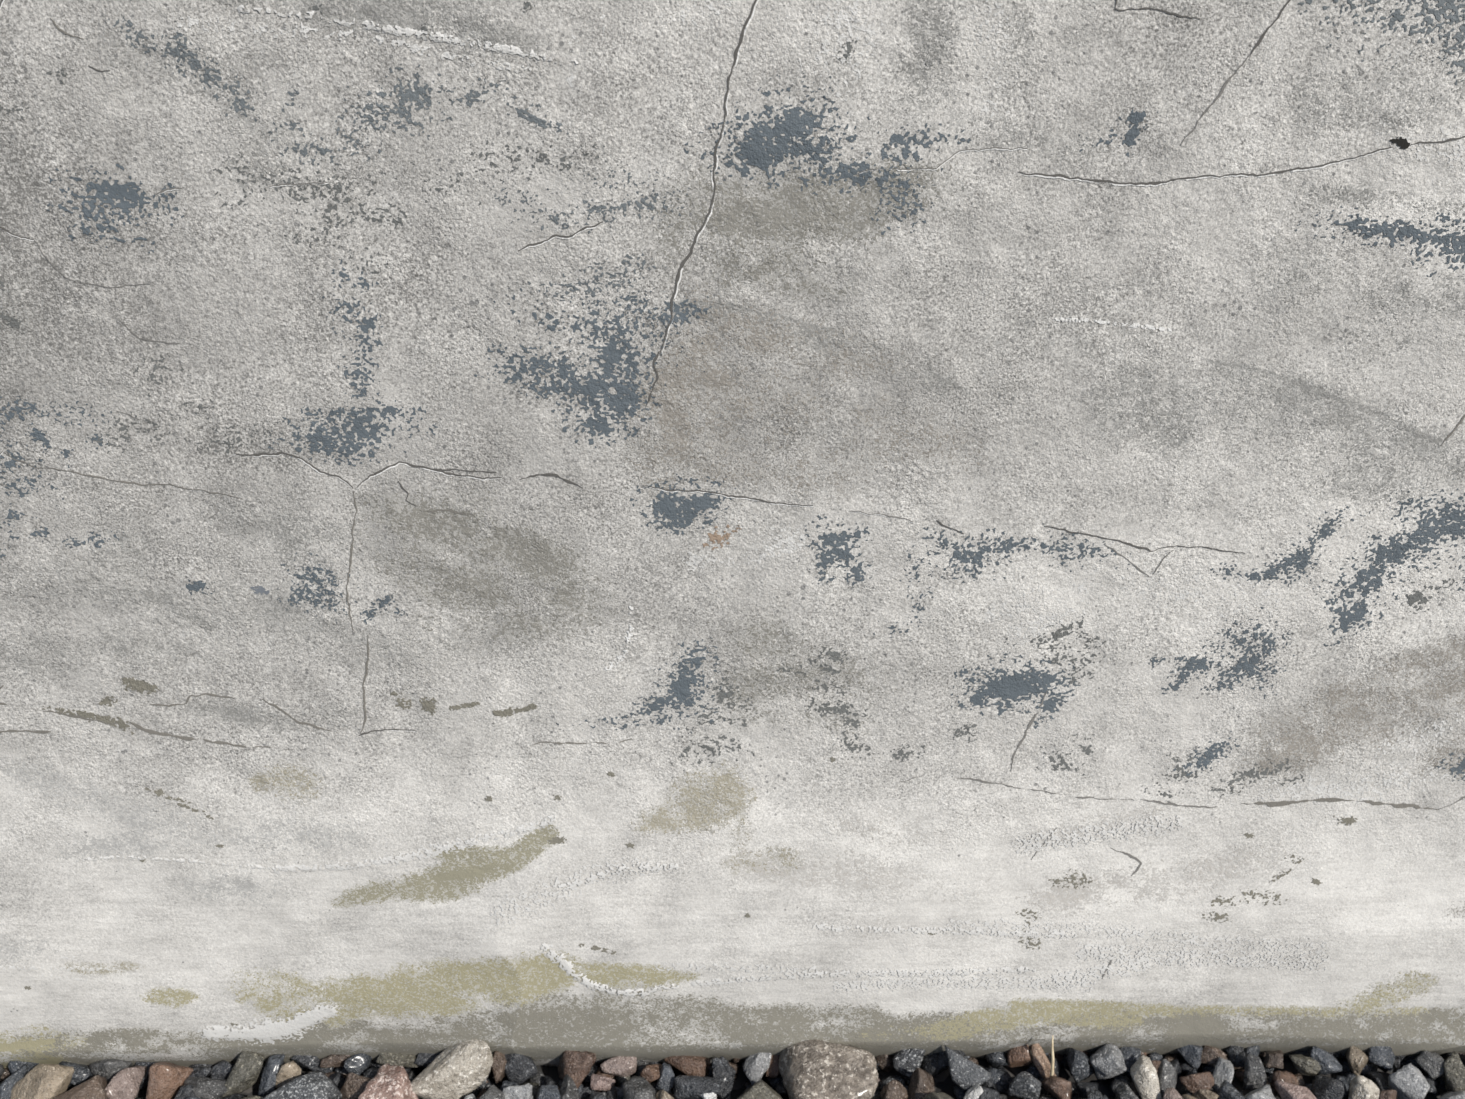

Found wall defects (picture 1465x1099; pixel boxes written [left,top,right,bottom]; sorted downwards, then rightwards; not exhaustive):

peeling [0,13,712,558]
crack [646,0,759,405]
peeling [684,73,972,240]
crack [859,0,1465,187]
peeling [1295,206,1465,277]
crack [1441,415,1465,446]
crack [0,450,583,750]
peeling [1202,473,1465,647]
leakage [0,752,392,909]
peeling [552,637,758,771]
peeling [951,614,1111,776]
crack [899,690,1465,810]